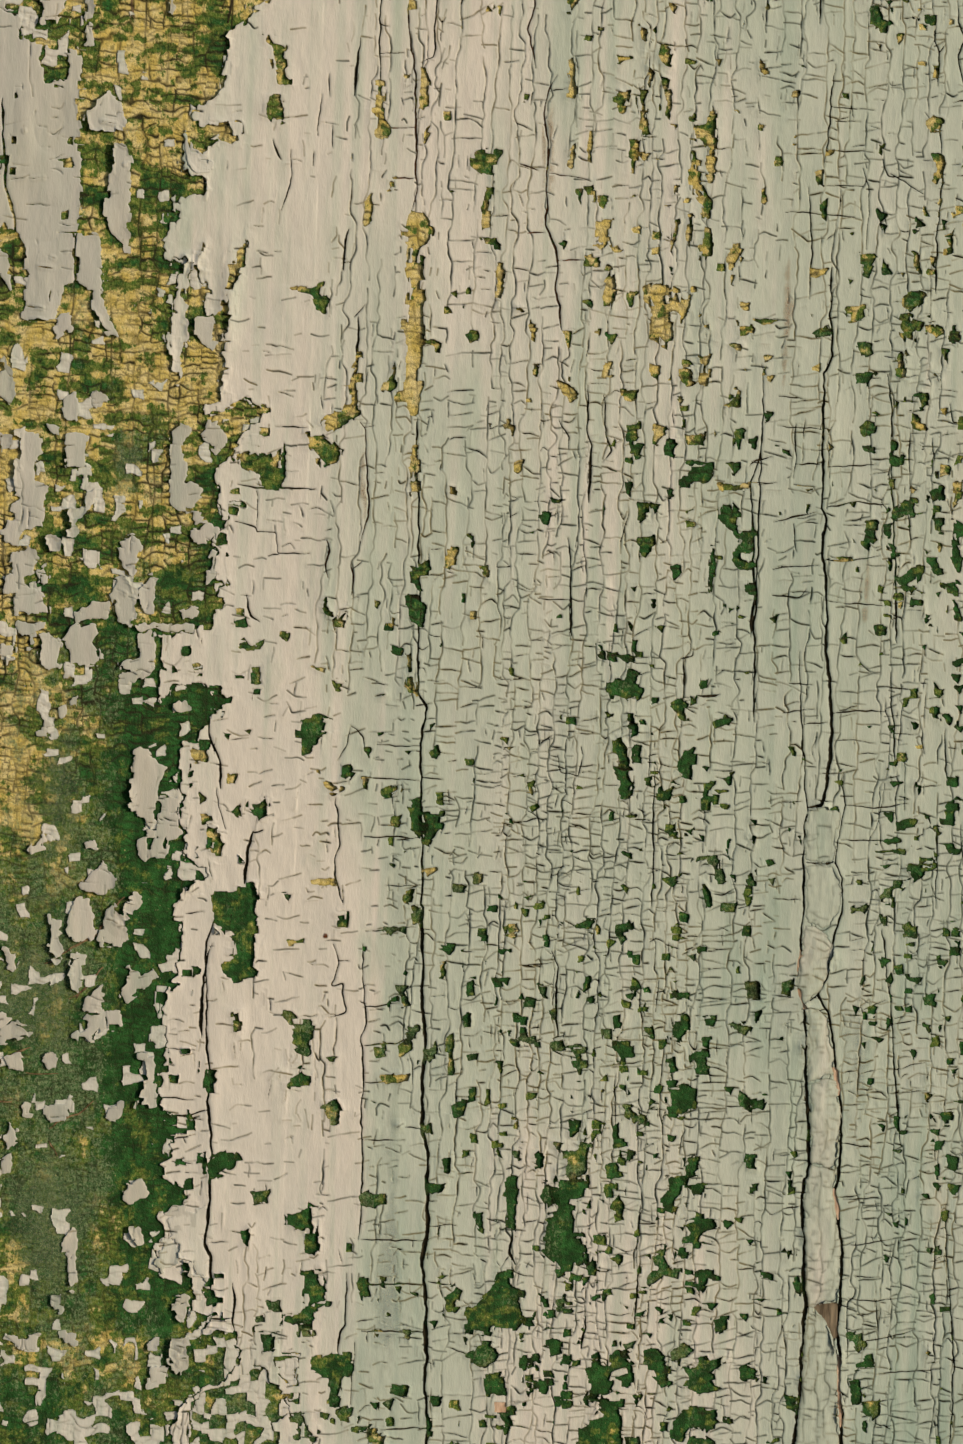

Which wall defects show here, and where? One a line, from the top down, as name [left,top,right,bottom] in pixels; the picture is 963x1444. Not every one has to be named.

peeling [381,210,442,419]
peeling [470,148,506,299]
peeling [811,304,866,338]
peeling [834,115,963,655]
peeling [374,533,475,698]
peeling [0,0,409,1444]
crack [205,688,296,884]
peeling [316,764,445,936]
crack [229,0,963,1444]
crack [164,911,245,1324]
peeling [356,621,793,1444]
peeling [781,1248,891,1433]